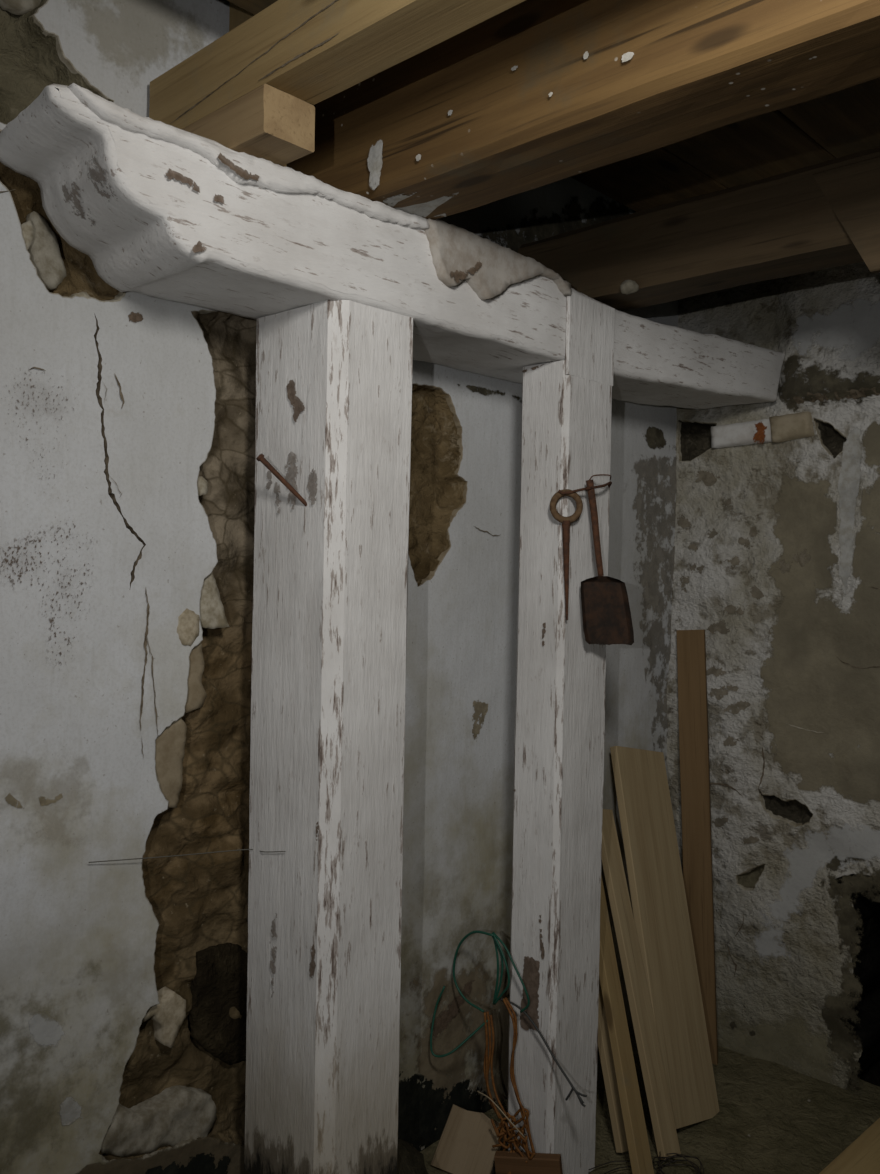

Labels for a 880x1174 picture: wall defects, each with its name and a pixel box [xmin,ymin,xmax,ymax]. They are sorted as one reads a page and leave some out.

peeling [0,0,572,302]
crack [94,313,158,756]
flaking render [98,309,317,1163]
flaking render [408,383,468,587]
peeling [680,528,718,593]
peeling [707,605,744,634]
peeling [706,666,750,714]
peeling [720,526,758,570]
peeling [757,418,880,827]